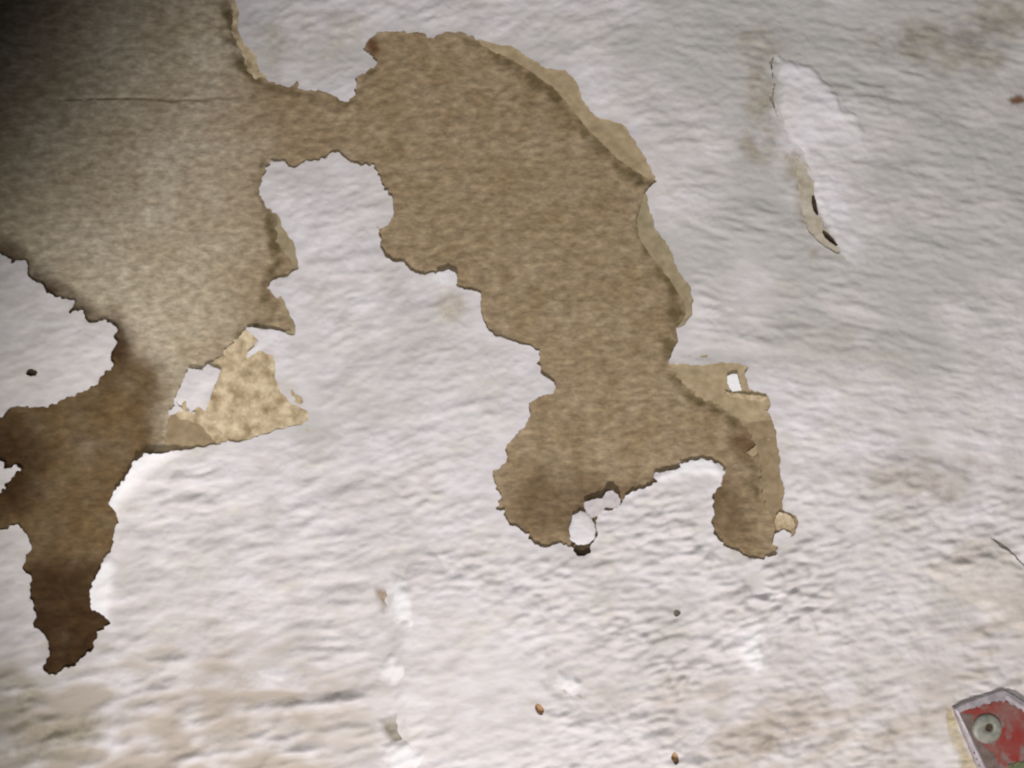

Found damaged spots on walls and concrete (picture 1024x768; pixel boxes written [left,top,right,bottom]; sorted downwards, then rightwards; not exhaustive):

crack [58,96,243,104]
peeling [775,53,869,272]
peeling [0,0,798,560]
peeling [90,553,121,629]